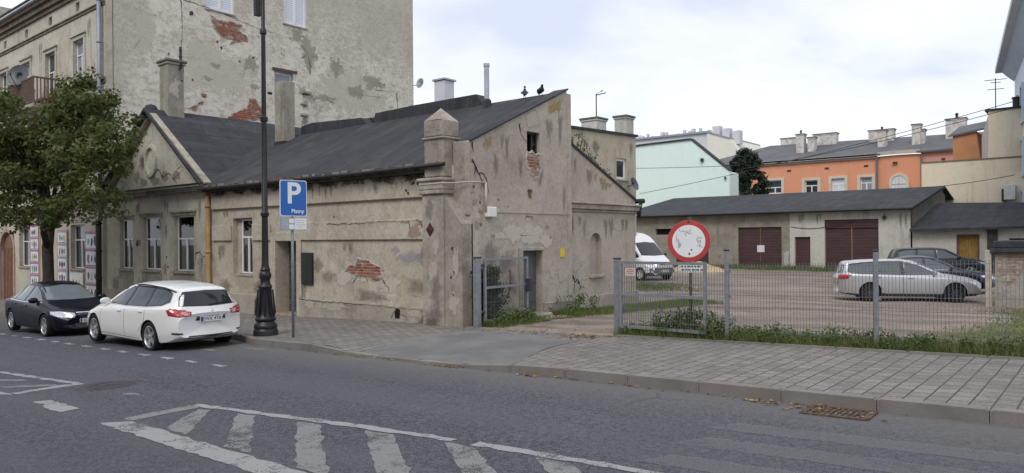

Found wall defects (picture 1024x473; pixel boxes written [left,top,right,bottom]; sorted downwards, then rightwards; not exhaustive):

flaking render [210,15,248,49]
flaking render [168,62,220,111]
flaking render [227,84,261,121]
flaking render [525,150,542,196]
flaking render [334,254,401,293]